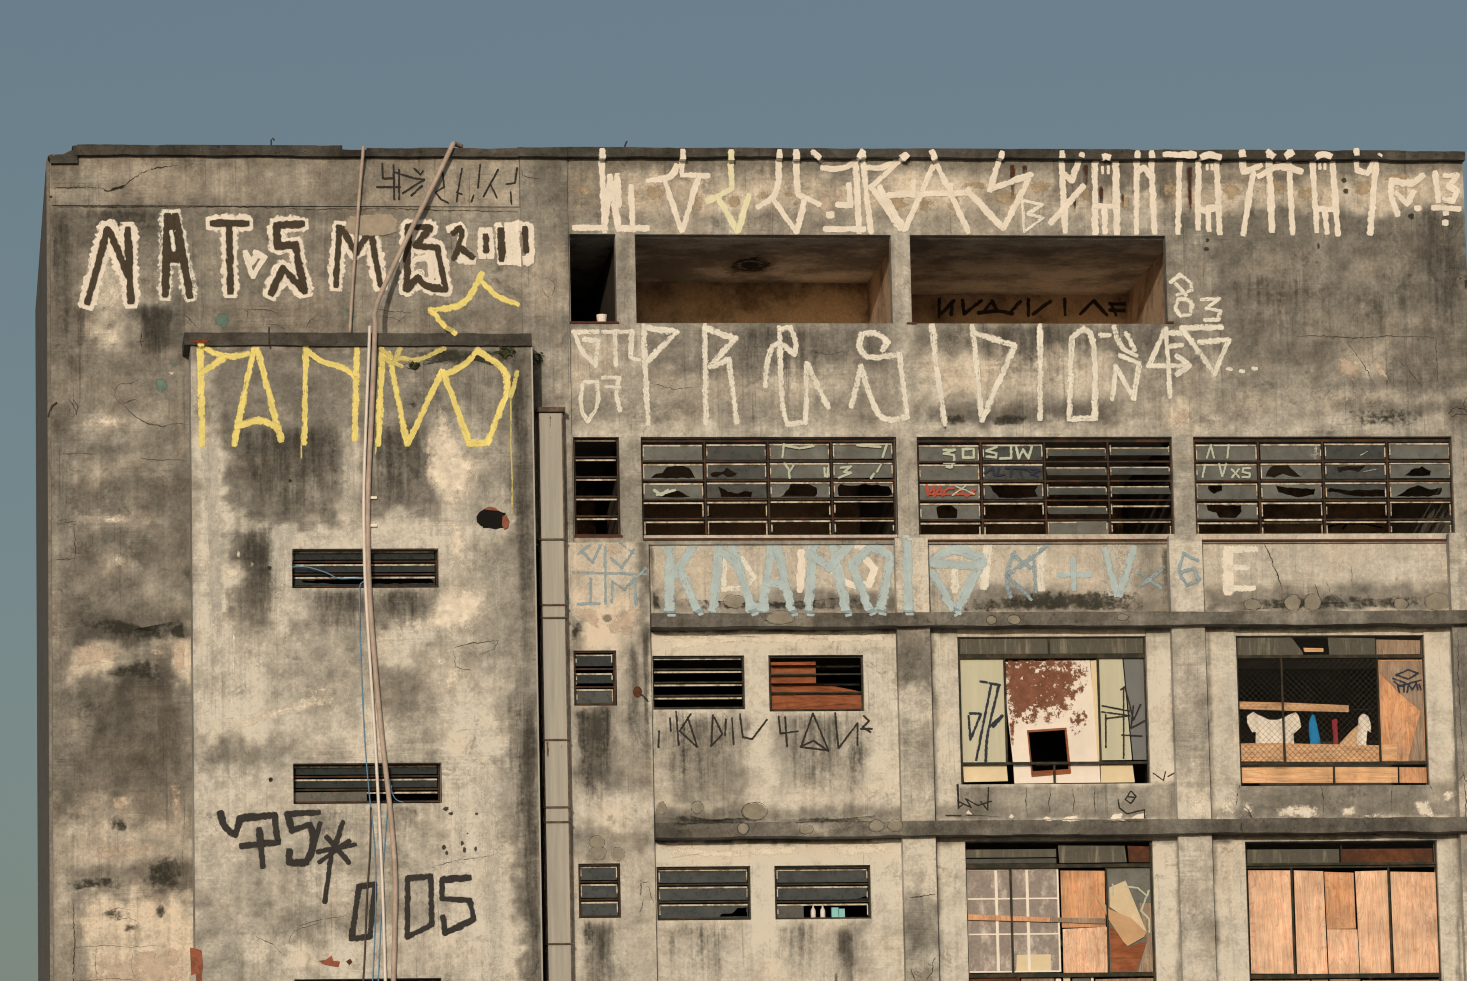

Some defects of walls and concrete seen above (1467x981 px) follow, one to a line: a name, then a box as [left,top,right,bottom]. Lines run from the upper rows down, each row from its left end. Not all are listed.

crack [56,165,517,212]
damp [723,255,775,276]
damp [264,433,315,479]
spalling [476,507,509,530]
crack [1243,544,1352,611]
damp [94,620,184,640]
damp [115,662,159,679]
damp [75,878,111,889]
damp [151,859,181,886]